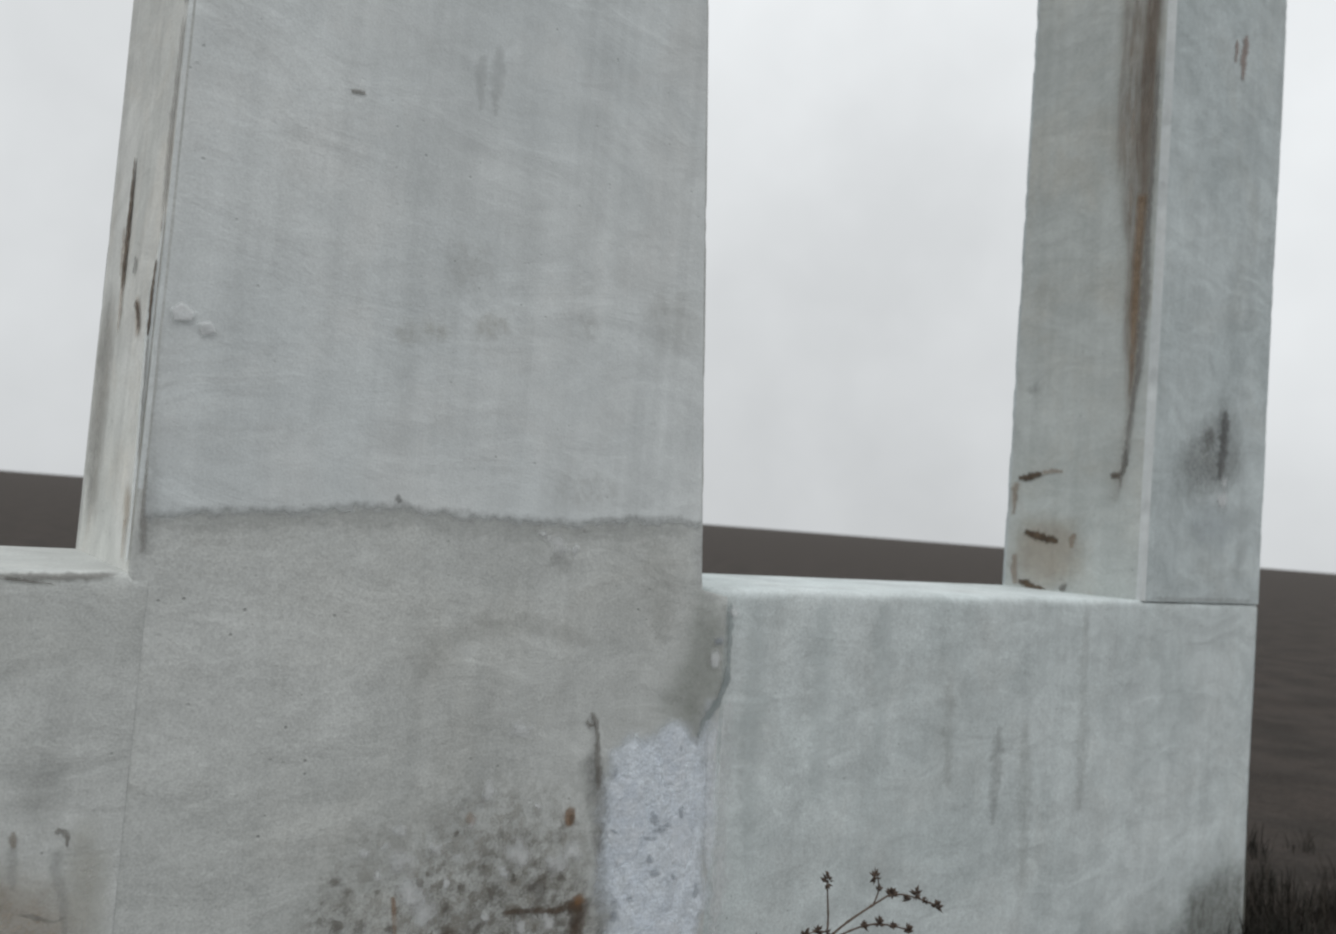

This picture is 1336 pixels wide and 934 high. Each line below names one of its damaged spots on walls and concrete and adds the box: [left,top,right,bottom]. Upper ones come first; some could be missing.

rust [121,159,135,288]
rust [1121,0,1159,382]
rust [1019,472,1042,481]
rust [1025,530,1058,543]
rust [1019,579,1066,591]
water stain [383,817,576,934]
rust [503,895,586,934]
peeling [600,723,716,934]